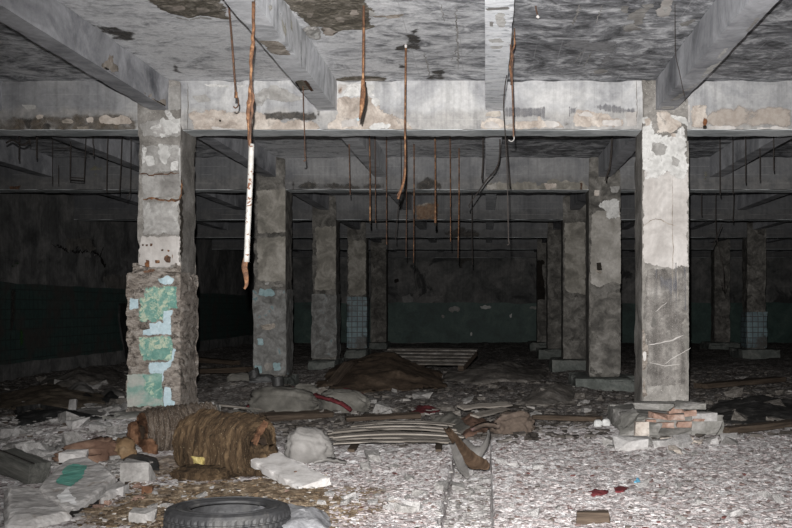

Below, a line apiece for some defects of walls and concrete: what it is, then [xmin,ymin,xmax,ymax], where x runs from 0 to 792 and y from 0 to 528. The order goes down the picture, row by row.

peeling [142,76,412,171]
peeling [573,48,791,179]
corrosion [416,203,438,220]
peeling [66,237,181,407]
crack [650,335,690,366]